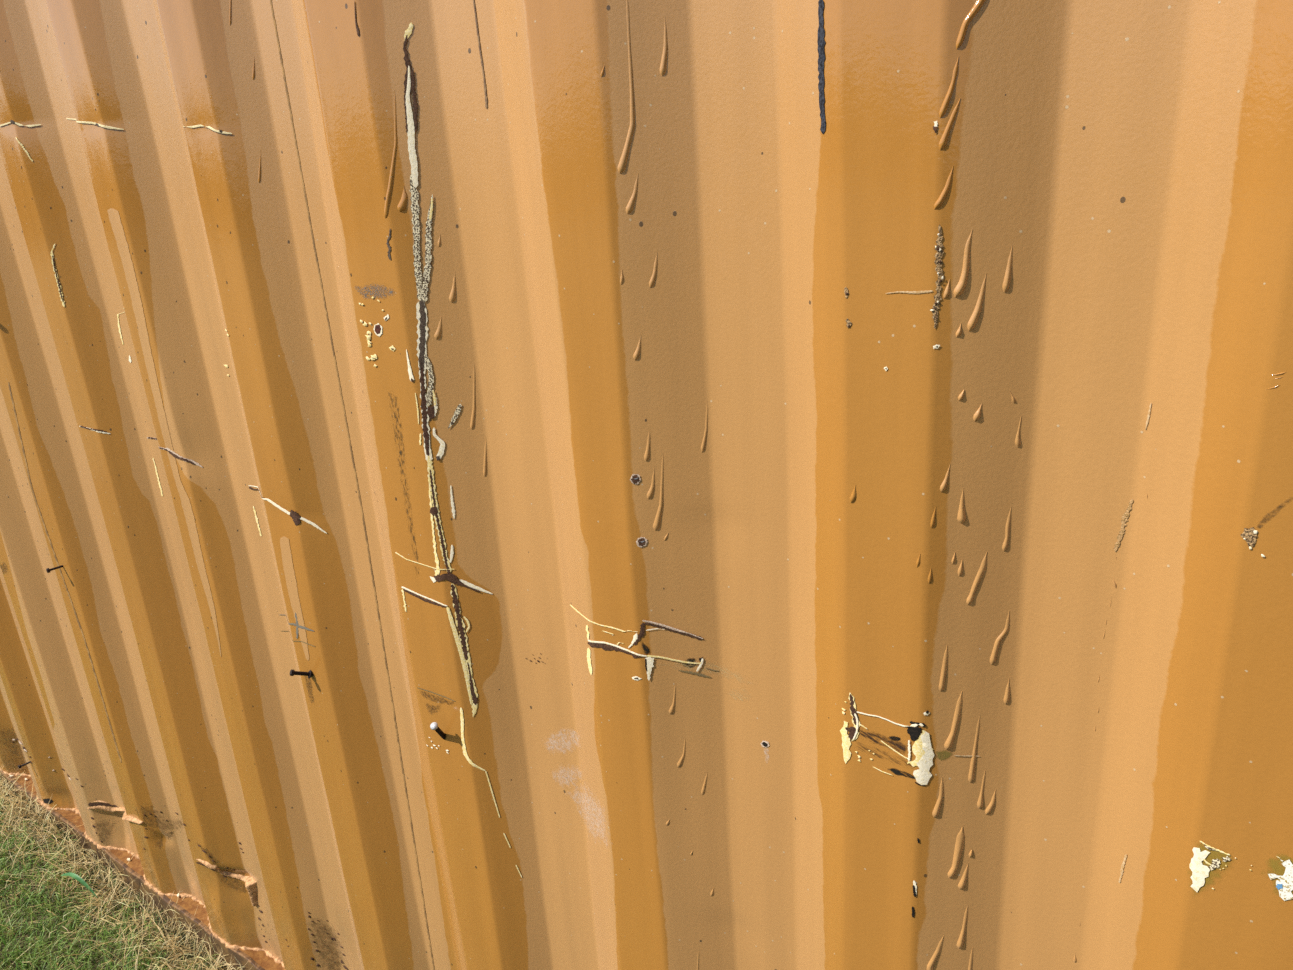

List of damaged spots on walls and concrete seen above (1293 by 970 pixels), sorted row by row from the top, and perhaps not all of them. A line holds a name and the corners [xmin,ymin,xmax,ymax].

peeling [433,404,462,461]
spalling [403,589,447,608]
spalling [570,605,740,680]
peeling [840,693,934,786]
peeling [1189,841,1236,892]
peeling [1268,857,1293,901]